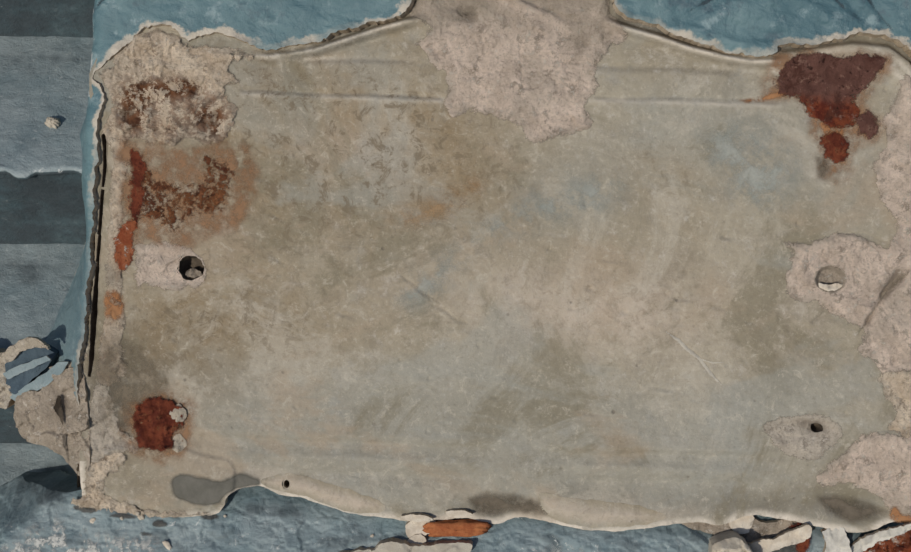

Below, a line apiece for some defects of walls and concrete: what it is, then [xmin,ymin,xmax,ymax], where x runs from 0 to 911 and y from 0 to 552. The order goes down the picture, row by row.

spalling [409,0,628,143]
corrosion [744,52,891,176]
spalling [0,28,264,518]
corrosion [113,142,257,272]
spalling [681,74,911,552]
corrosion [128,393,190,456]